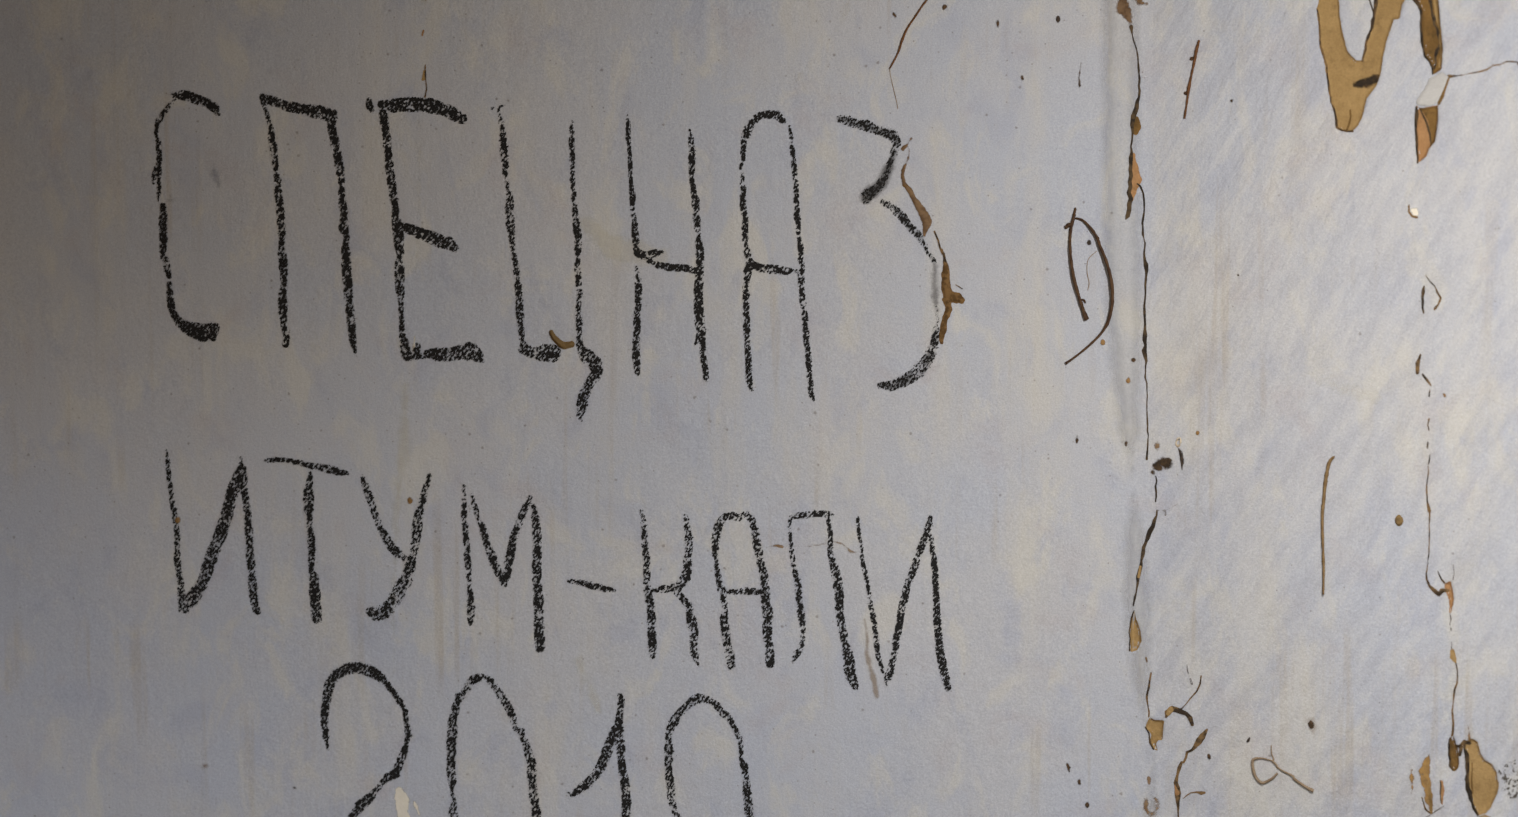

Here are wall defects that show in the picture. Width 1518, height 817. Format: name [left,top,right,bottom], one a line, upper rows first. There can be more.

flaking render [1316,0,1448,164]
crack [1437,61,1518,105]
crack [1421,275,1442,313]
crack [1125,25,1208,817]
crack [1415,354,1463,771]
flaking render [1458,728,1518,817]